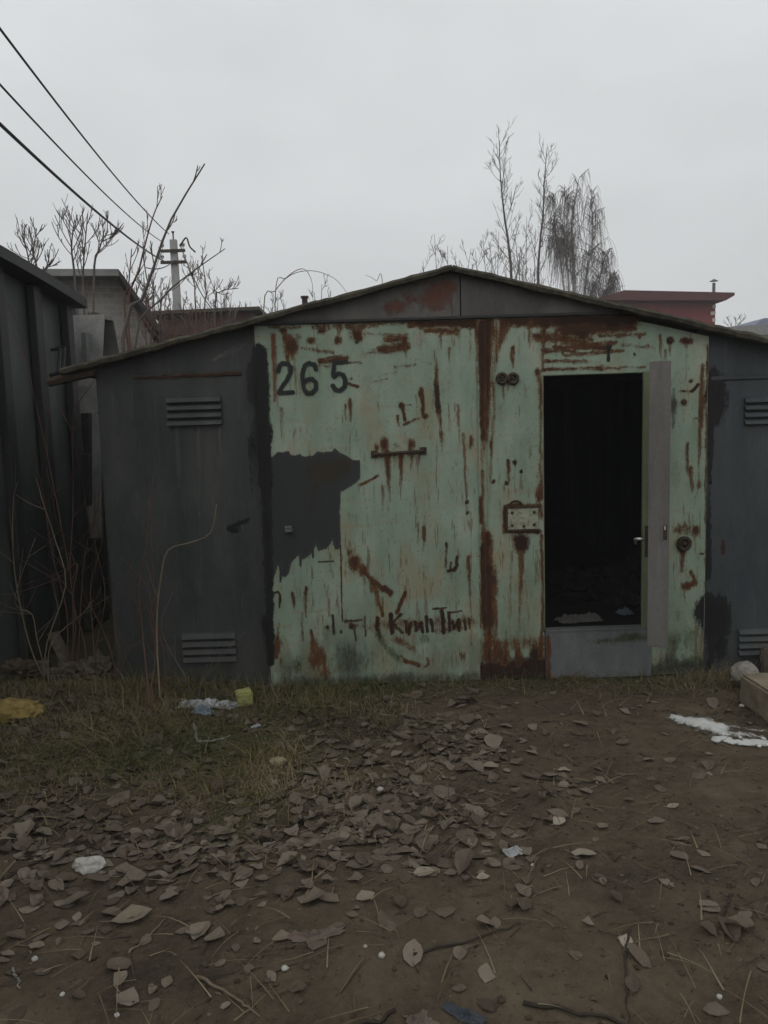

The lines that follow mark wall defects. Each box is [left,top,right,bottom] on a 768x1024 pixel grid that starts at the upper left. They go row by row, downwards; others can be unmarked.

corrosion [270,315,693,681]
corrosion [674,344,709,603]